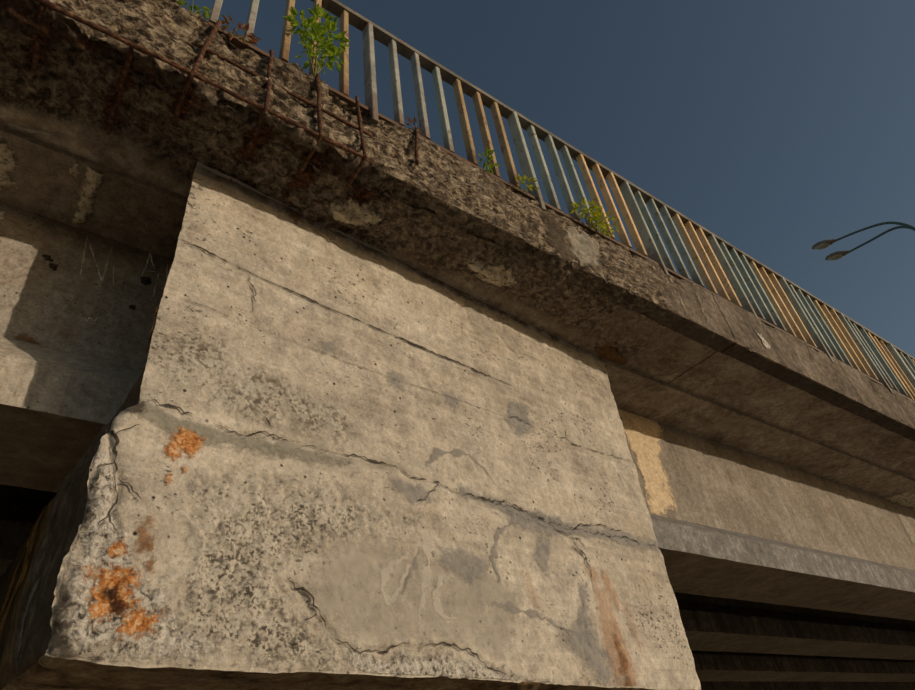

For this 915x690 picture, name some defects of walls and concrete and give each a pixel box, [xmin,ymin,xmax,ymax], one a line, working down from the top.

spalling [0,135,22,190]
crack [91,424,142,530]
rust [159,427,204,484]
crack [150,398,655,582]
rust [82,516,165,639]
crack [288,579,506,675]
rust [592,574,635,686]